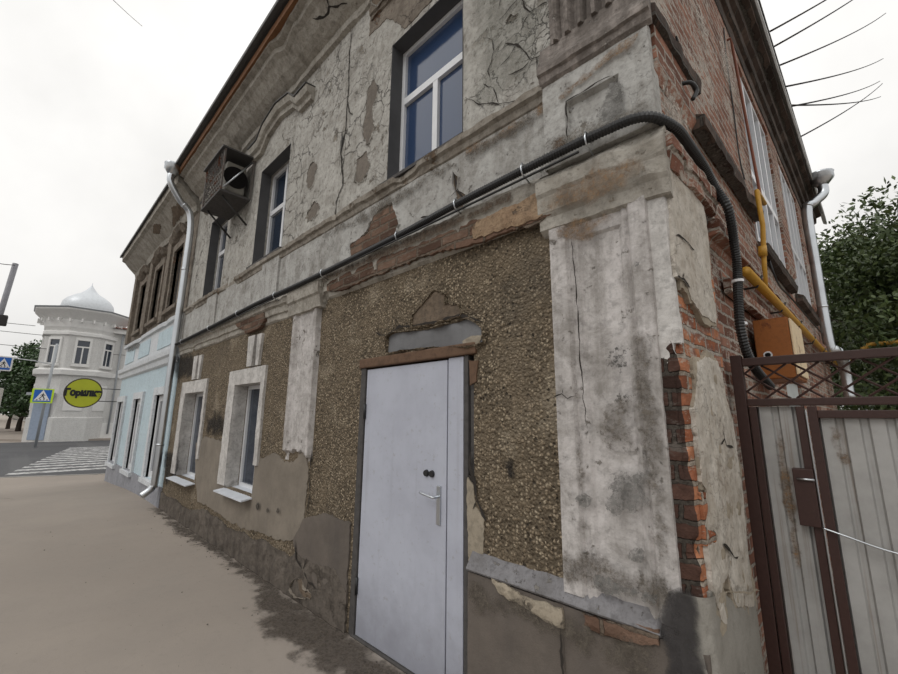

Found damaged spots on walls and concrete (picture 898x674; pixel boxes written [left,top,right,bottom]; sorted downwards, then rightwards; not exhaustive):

crack [313,0,347,20]
crack [465,0,547,105]
crack [335,27,353,214]
flaking render [349,201,401,256]
flaking render [657,314,757,637]